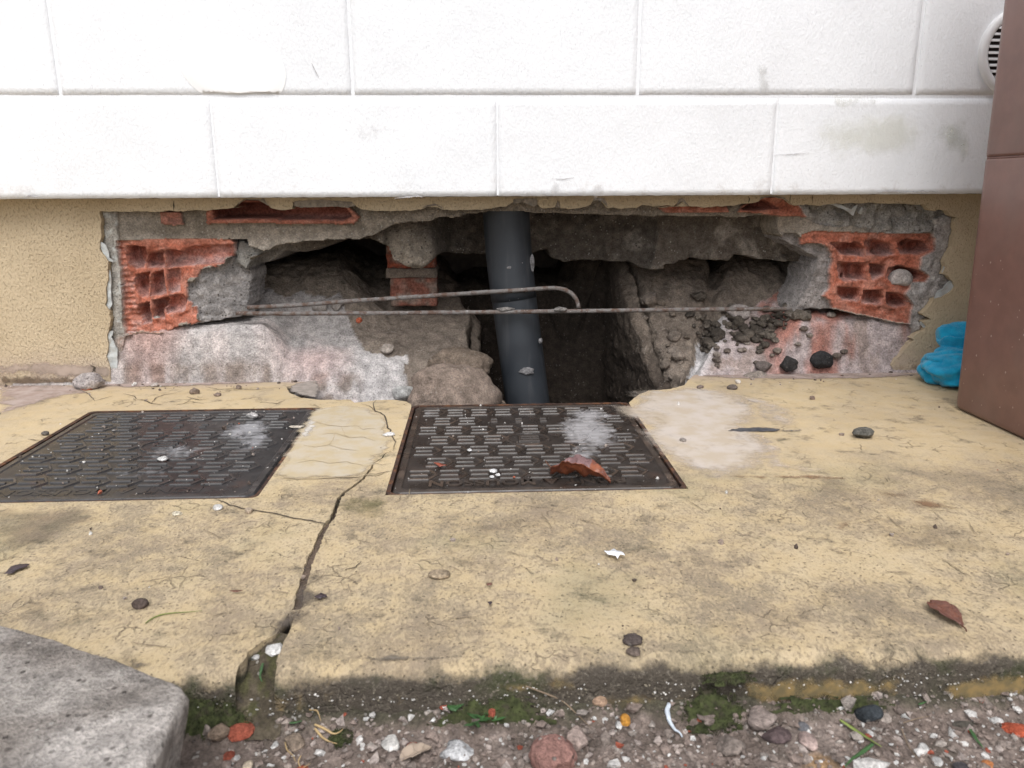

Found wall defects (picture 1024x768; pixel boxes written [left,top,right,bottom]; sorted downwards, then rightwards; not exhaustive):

spalling [100,211,130,368]
spalling [294,199,355,208]
spalling [236,286,793,323]
spalling [513,198,537,207]
spalling [759,196,953,333]
crack [205,403,396,741]